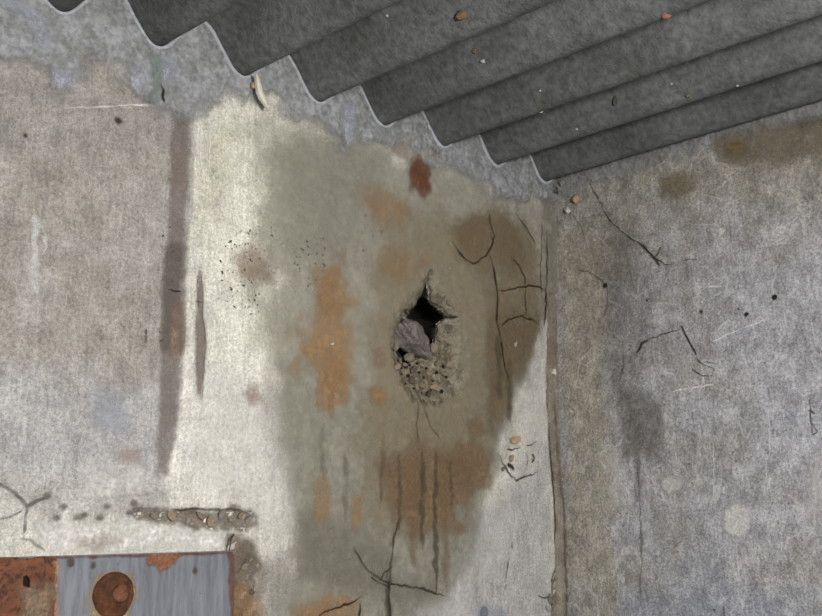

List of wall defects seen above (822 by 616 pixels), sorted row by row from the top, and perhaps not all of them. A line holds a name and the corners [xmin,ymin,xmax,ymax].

rust [411,159,431,196]
crack [588,180,672,266]
leakage [220,103,555,616]
spalling [390,266,469,405]
crack [453,213,548,381]
rust [381,444,490,538]
crack [546,390,556,532]
spalling [128,501,262,616]
crack [355,522,443,616]